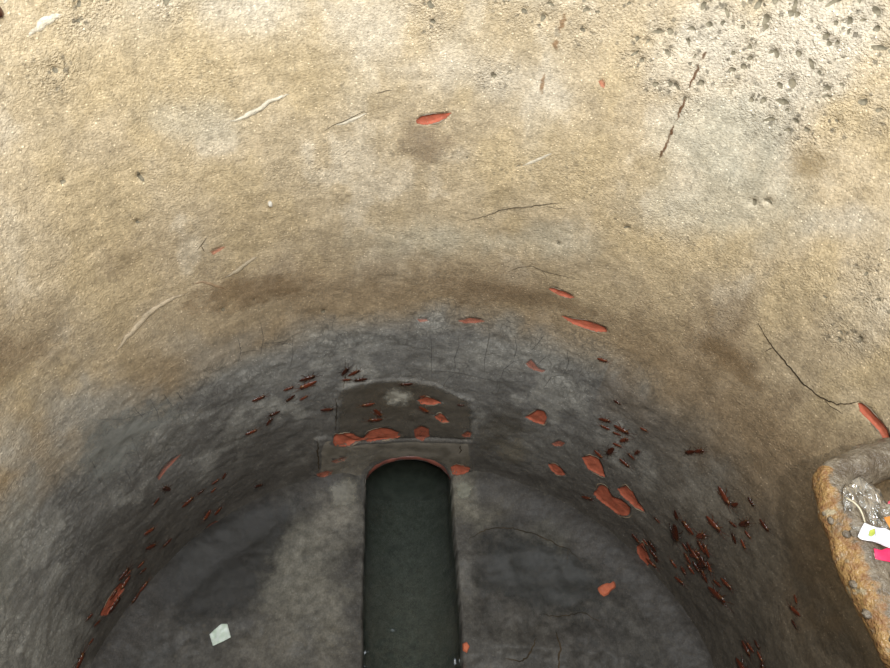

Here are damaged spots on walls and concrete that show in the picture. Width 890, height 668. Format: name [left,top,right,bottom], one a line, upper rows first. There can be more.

spalling [631,28,674,62]
spalling [416,113,451,125]
spalling [562,316,607,333]
crack [758,324,859,414]
spalling [418,396,450,424]
spalling [526,410,547,426]
spalling [858,403,889,438]
spalling [333,427,400,448]
spalling [451,464,470,476]
spalling [582,454,645,518]